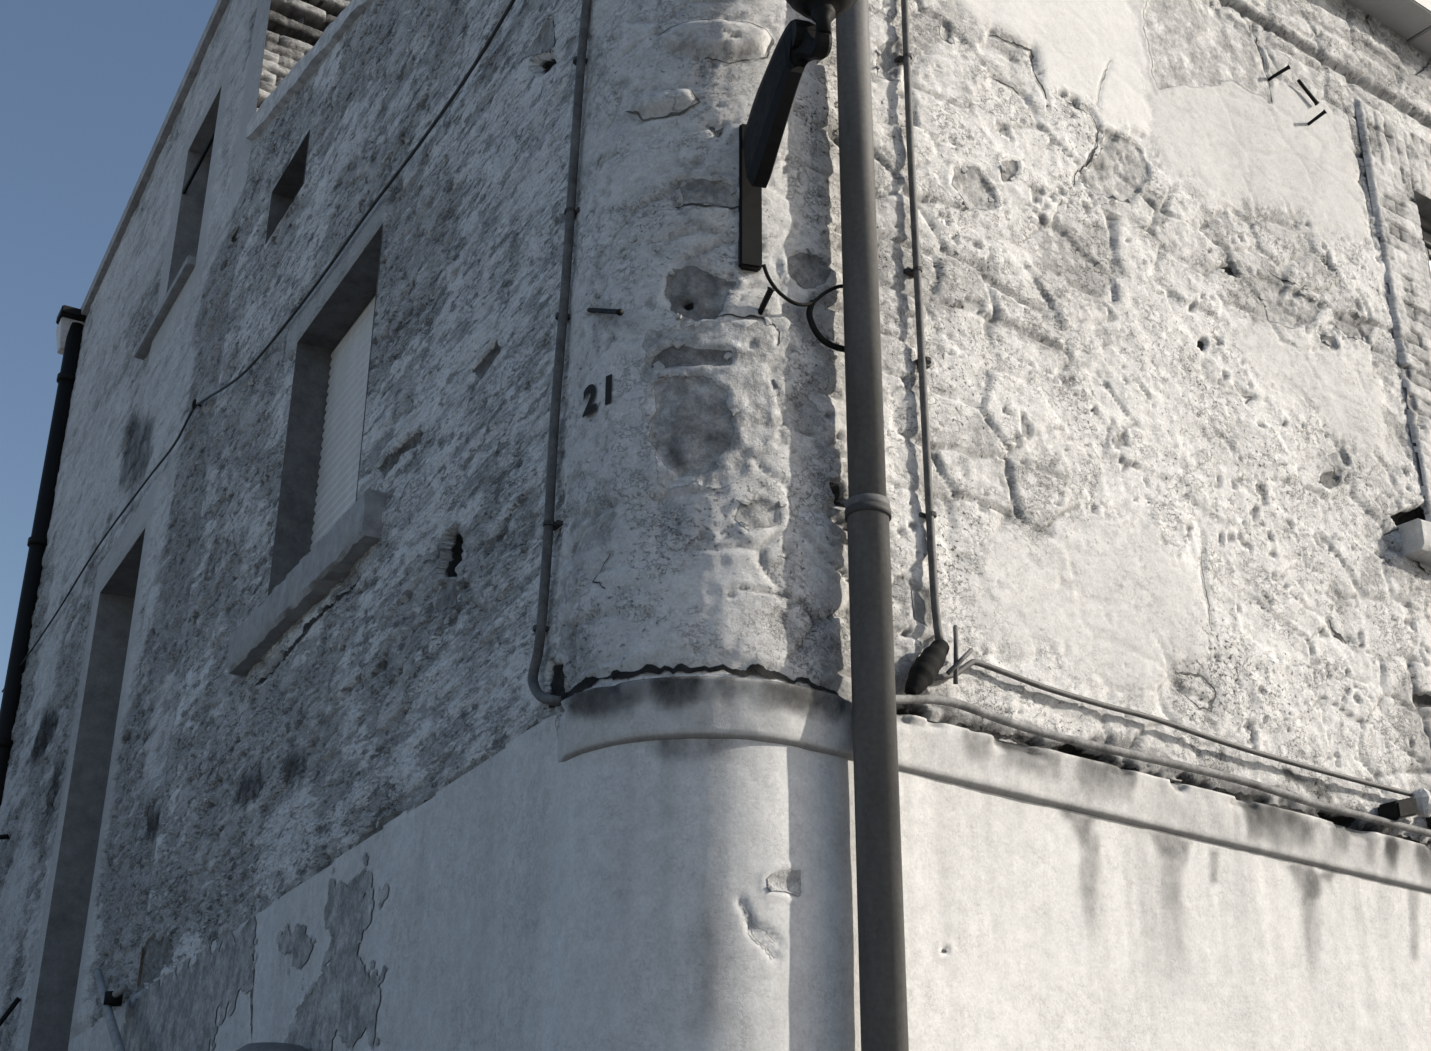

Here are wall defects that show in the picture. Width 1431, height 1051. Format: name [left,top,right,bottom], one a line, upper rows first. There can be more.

crack [987,35,1111,186]
spalling [952,160,1018,211]
spalling [1257,275,1375,349]
spalling [638,266,792,532]
spalling [1320,451,1348,489]
hole [1391,506,1426,526]
water stain [1243,804,1312,836]
water stain [1387,839,1399,862]
spalling [767,870,802,897]
water stain [1293,866,1332,891]
peeling [276,811,403,1051]
peeling [120,915,257,1051]